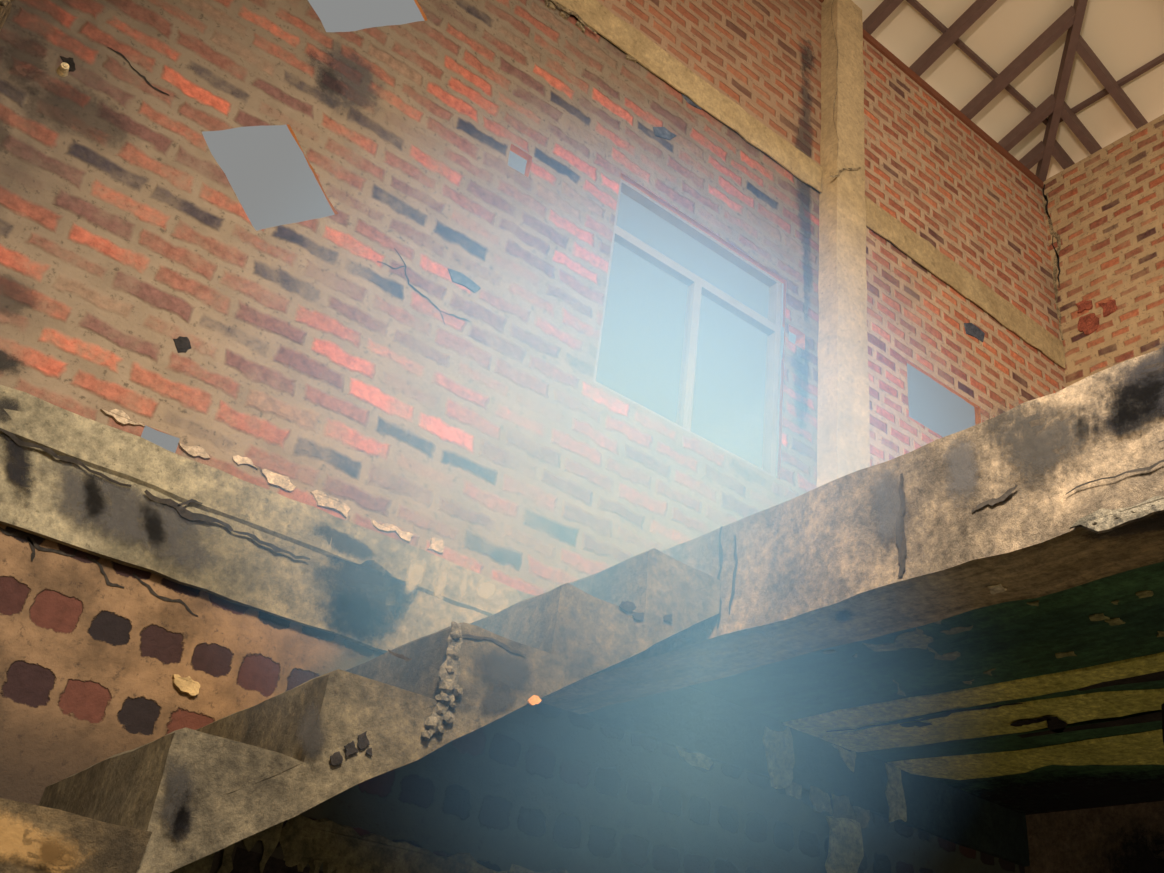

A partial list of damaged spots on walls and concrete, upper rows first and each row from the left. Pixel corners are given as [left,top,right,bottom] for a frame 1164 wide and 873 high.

crack [1042,184,1064,340]
damp [0,350,20,372]
damp [0,399,35,503]
spalling [100,409,145,427]
crack [0,428,310,560]
spalling [232,455,296,492]
damp [985,343,1164,491]
crack [1065,440,1164,495]
crack [0,527,198,617]
damp [316,525,424,644]
spalling [420,621,463,741]
flaking render [782,651,1164,780]